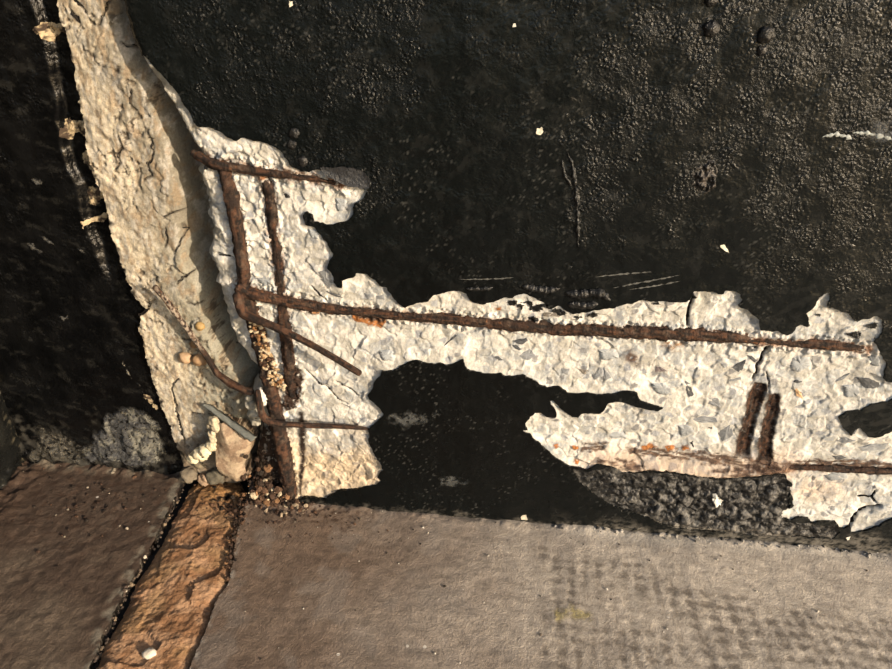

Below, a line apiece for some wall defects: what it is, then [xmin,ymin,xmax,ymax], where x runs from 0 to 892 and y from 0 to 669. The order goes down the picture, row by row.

crack [70,0,109,23]
crack [164,209,190,248]
rust [352,315,386,328]
spalling [144,56,892,540]
rust [248,321,306,492]
rust [572,383,892,478]